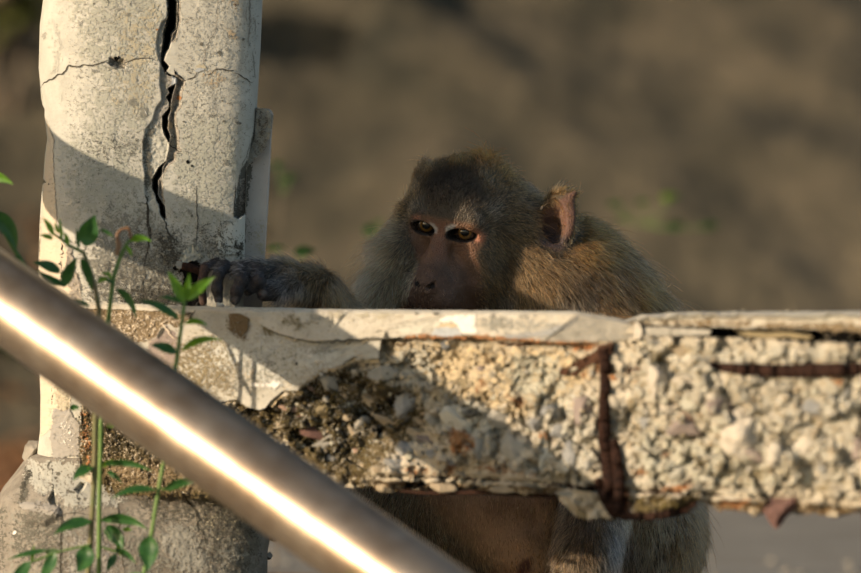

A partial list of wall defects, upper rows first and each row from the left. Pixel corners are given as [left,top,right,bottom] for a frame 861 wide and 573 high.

crack [41,0,256,294]
spalling [199,310,861,529]